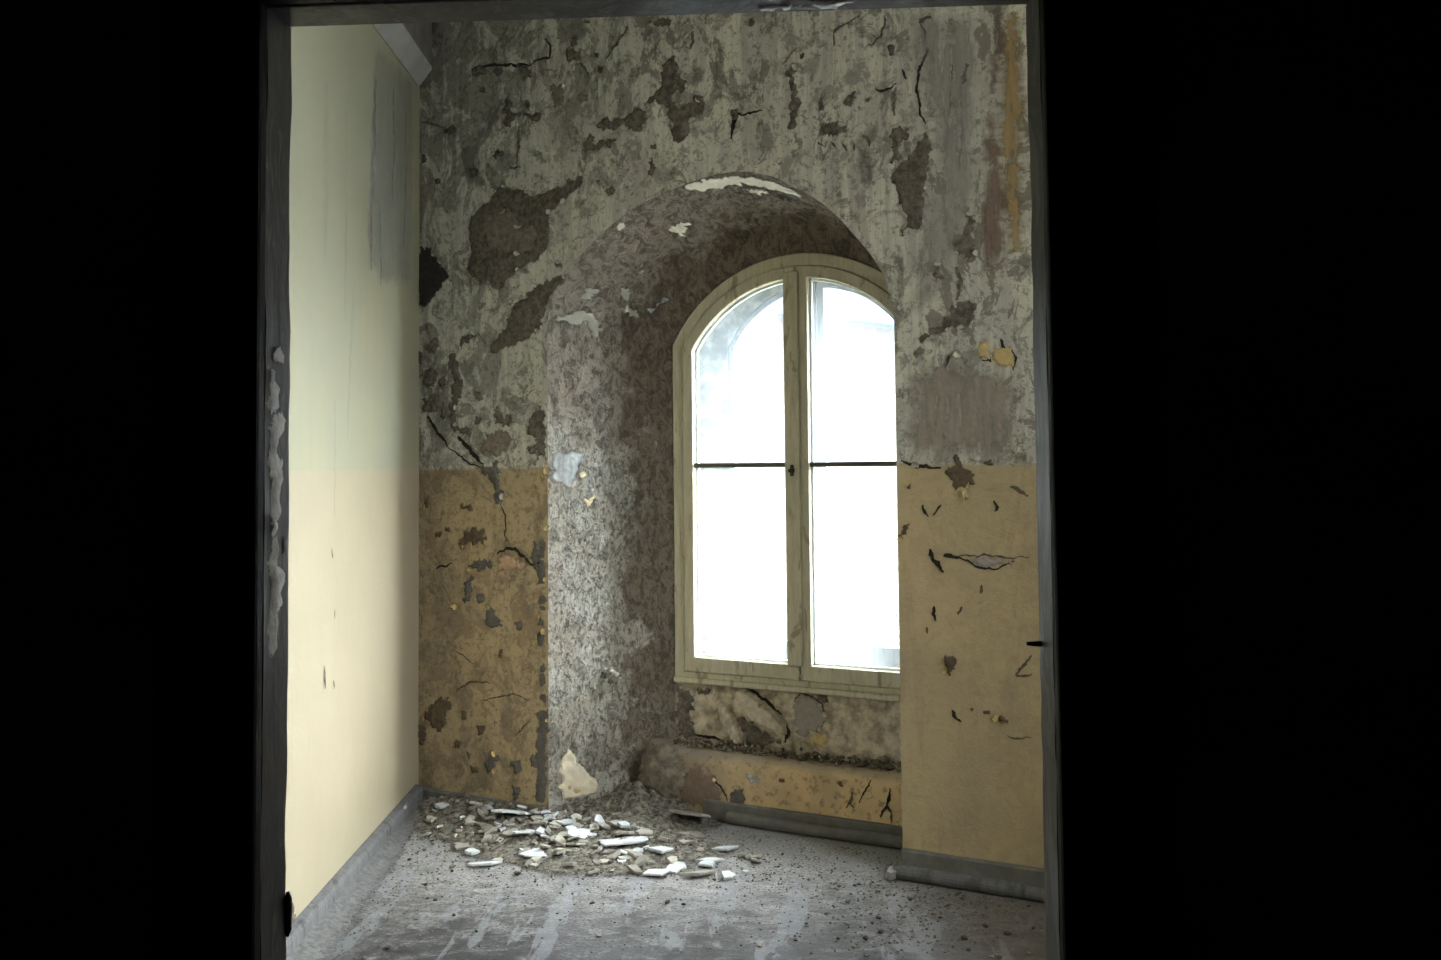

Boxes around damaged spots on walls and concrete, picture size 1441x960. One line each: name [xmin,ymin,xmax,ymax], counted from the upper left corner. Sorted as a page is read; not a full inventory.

peeling [583,31,705,176]
peeling [669,222,691,237]
spalling [685,176,801,203]
peeling [782,47,805,130]
peeling [888,88,932,237]
spalling [418,171,675,541]
peeling [265,347,286,657]
crack [427,415,484,468]
spalling [434,503,549,647]
crack [497,546,539,571]
peeling [418,664,599,803]
spalling [674,646,828,749]